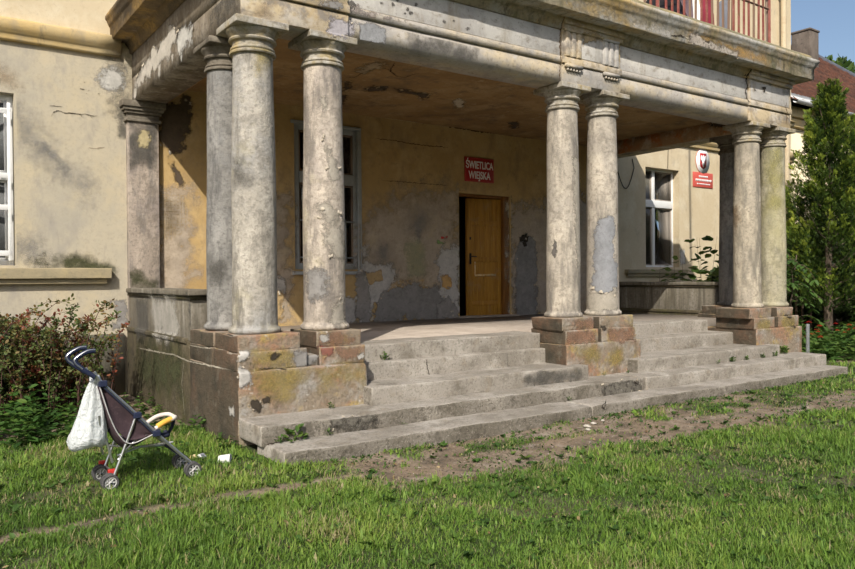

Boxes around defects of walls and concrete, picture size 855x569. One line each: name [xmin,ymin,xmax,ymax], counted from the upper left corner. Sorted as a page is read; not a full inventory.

peeling [95,20,193,99]
peeling [318,0,417,39]
peeling [321,135,342,181]
peeling [276,192,298,326]
peeling [314,188,460,361]
peeling [505,197,557,314]
peeling [567,156,636,345]
flaking render [237,350,253,388]